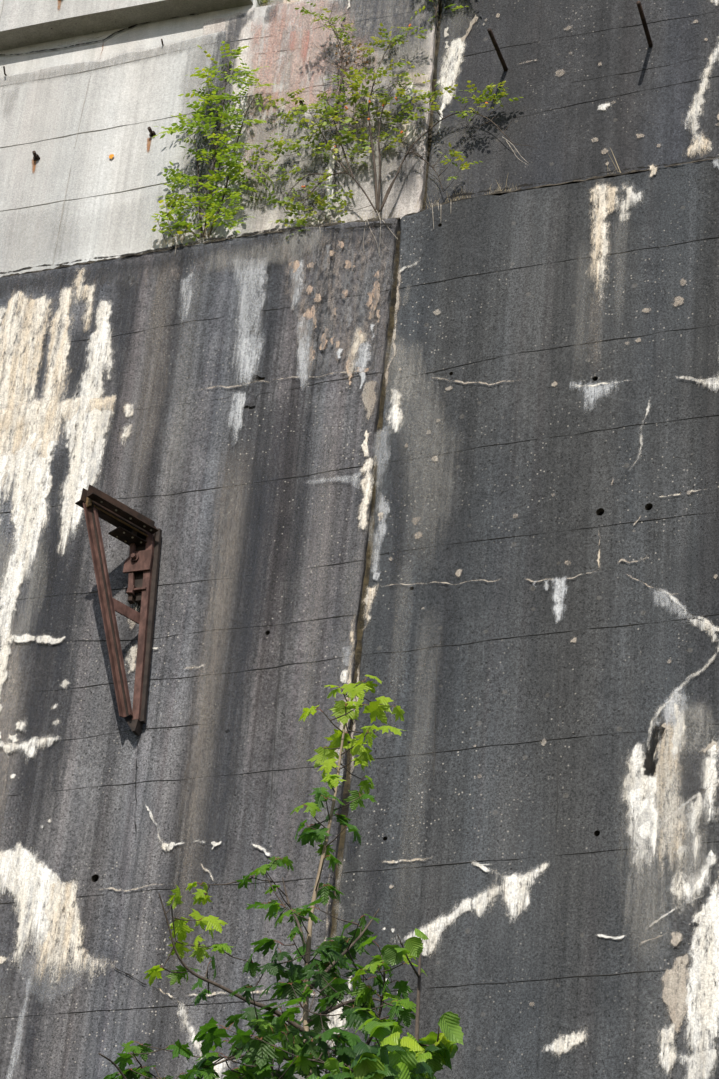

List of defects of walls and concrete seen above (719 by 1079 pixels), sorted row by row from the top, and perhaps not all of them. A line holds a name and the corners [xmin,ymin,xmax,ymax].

leakage [291,261,304,304]
efflorescence [590,184,641,289]
leakage [230,245,282,431]
leakage [298,316,315,379]
efflorescence [388,390,402,432]
efflorescence [578,382,610,404]
leakage [0,270,136,795]
crack [527,530,719,669]
spalling [643,709,671,776]
crack [649,688,685,730]
efflorescence [622,693,719,1079]
leakage [0,843,102,1068]